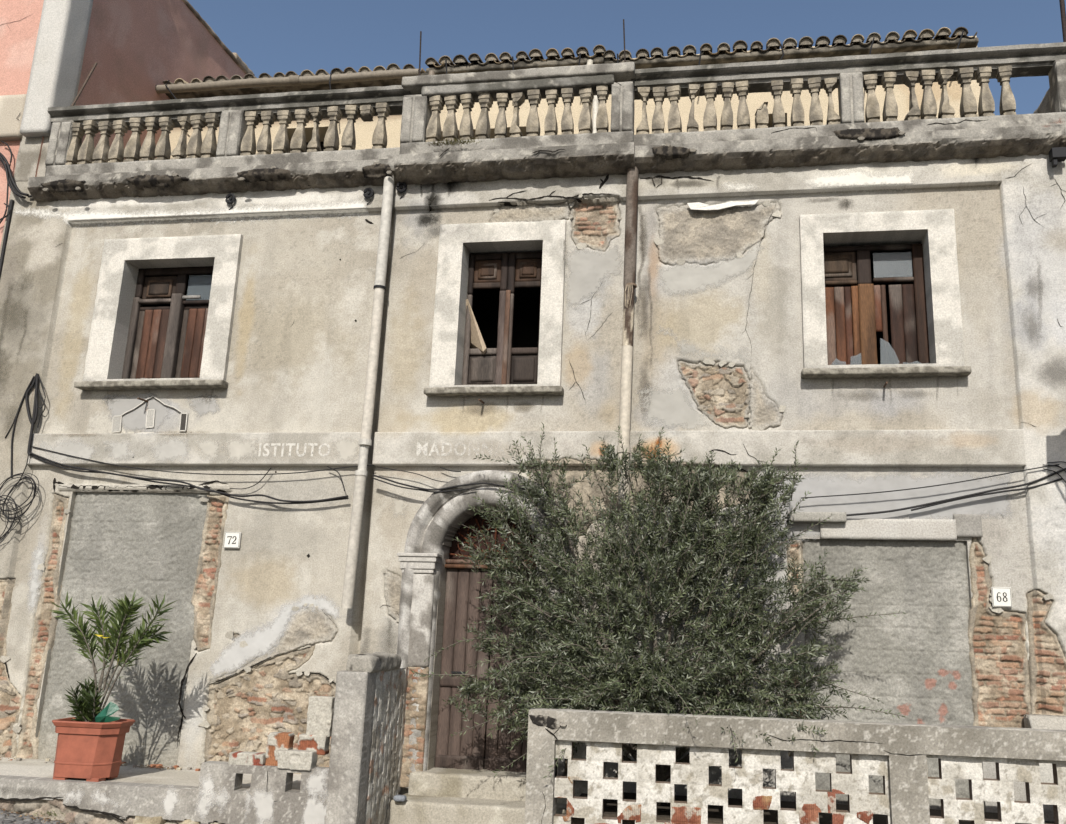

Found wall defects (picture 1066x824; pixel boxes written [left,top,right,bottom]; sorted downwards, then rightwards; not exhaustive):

crack [491,174,615,206]
flaking render [490,194,622,252]
flaking render [654,182,782,295]
peeling [805,169,914,191]
crack [1008,166,1066,228]
flaking render [677,358,786,431]
flaking render [0,493,71,759]
flaking render [191,495,340,774]
flaking render [968,537,1066,728]